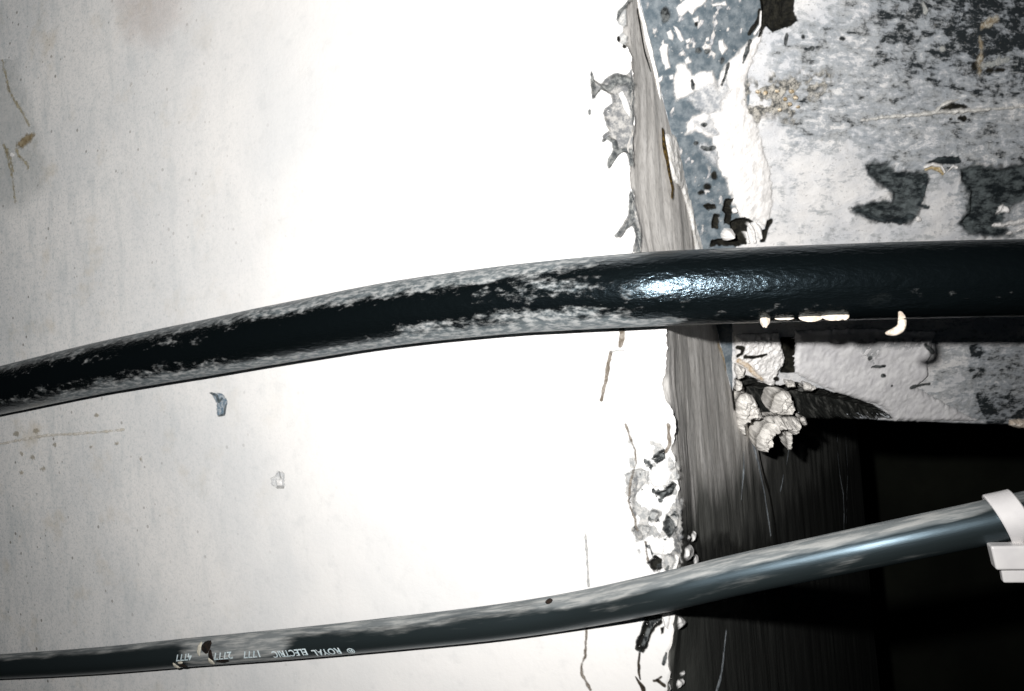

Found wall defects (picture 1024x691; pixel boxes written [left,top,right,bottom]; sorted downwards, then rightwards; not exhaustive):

corrosion [2,60,34,198]
spalling [588,69,634,168]
flaking render [617,0,752,100]
spalling [744,72,831,123]
spalling [615,190,641,253]
flaking render [665,133,722,249]
flaking render [851,162,929,225]
flaking render [959,163,1024,238]
spalling [625,423,699,571]